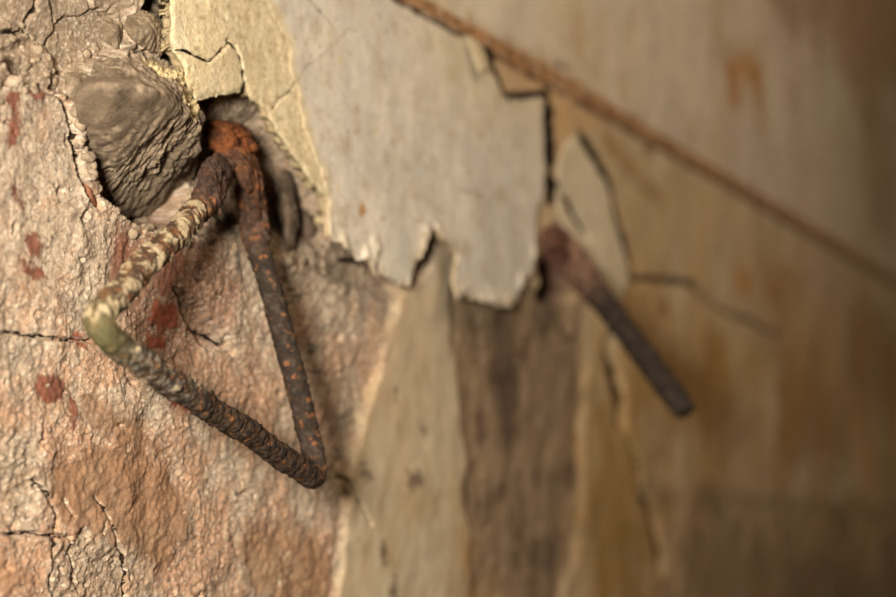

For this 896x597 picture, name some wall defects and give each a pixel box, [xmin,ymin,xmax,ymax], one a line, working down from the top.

crack [0,329,84,343]
rust [197,118,271,243]
spalling [0,0,587,597]
crack [406,6,585,236]
rust [541,222,573,269]
peeling [556,134,629,302]
crack [579,128,783,344]
crack [0,479,77,588]
crack [97,502,127,596]